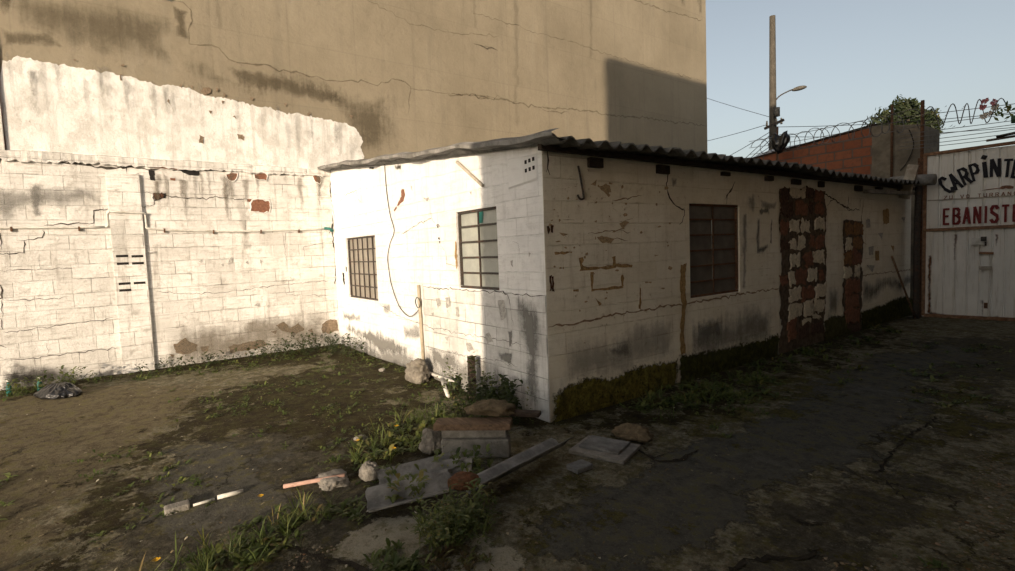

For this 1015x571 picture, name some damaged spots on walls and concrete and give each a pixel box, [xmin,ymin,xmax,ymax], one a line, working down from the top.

leakage [175,9,186,37]
leakage [237,72,337,100]
leakage [0,186,90,215]
crack [61,162,243,207]
flaking render [149,167,179,181]
crack [0,209,116,369]
peeling [549,203,632,312]
flaking render [757,186,827,354]
flaking render [842,208,894,333]
peeling [310,319,339,334]
leakage [345,315,411,368]
leakage [426,350,519,407]